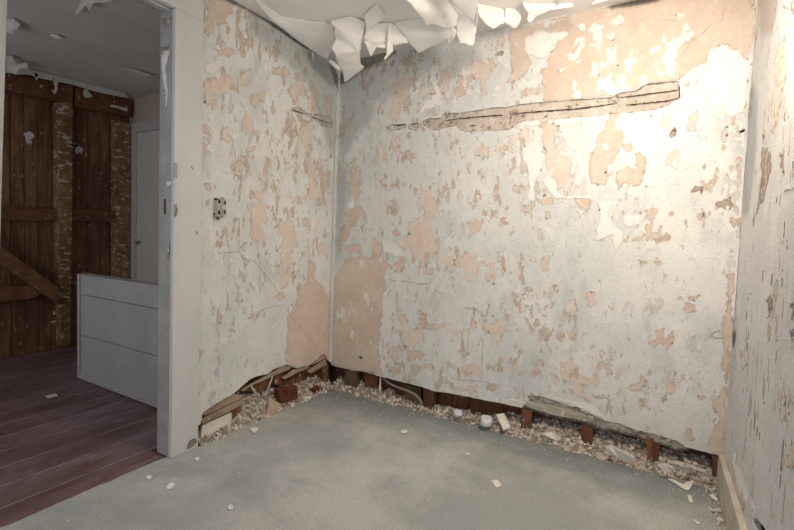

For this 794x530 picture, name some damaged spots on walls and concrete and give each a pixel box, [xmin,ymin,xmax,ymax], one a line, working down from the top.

peeling [74,0,113,17]
peeling [202,0,756,451]
peeling [668,0,794,244]
peeling [690,221,794,523]